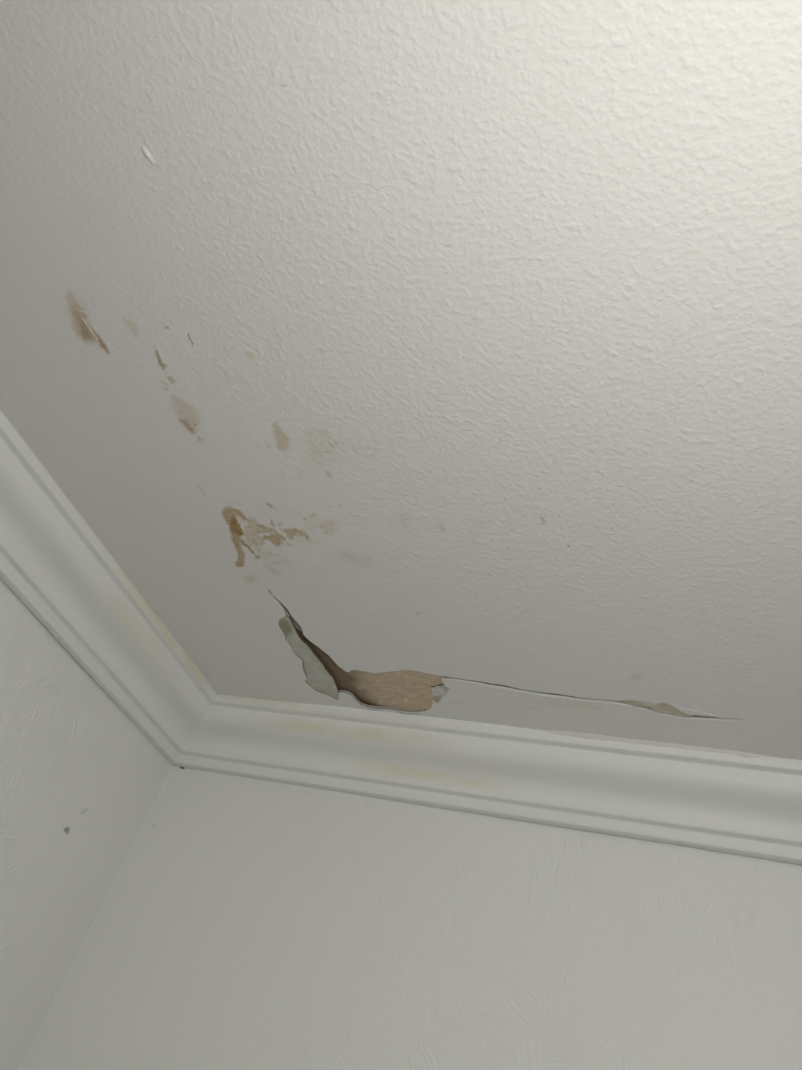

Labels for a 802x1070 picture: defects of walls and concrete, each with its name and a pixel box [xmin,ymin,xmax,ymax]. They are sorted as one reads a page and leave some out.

peeling [279,616,450,712]
crack [443,676,771,726]